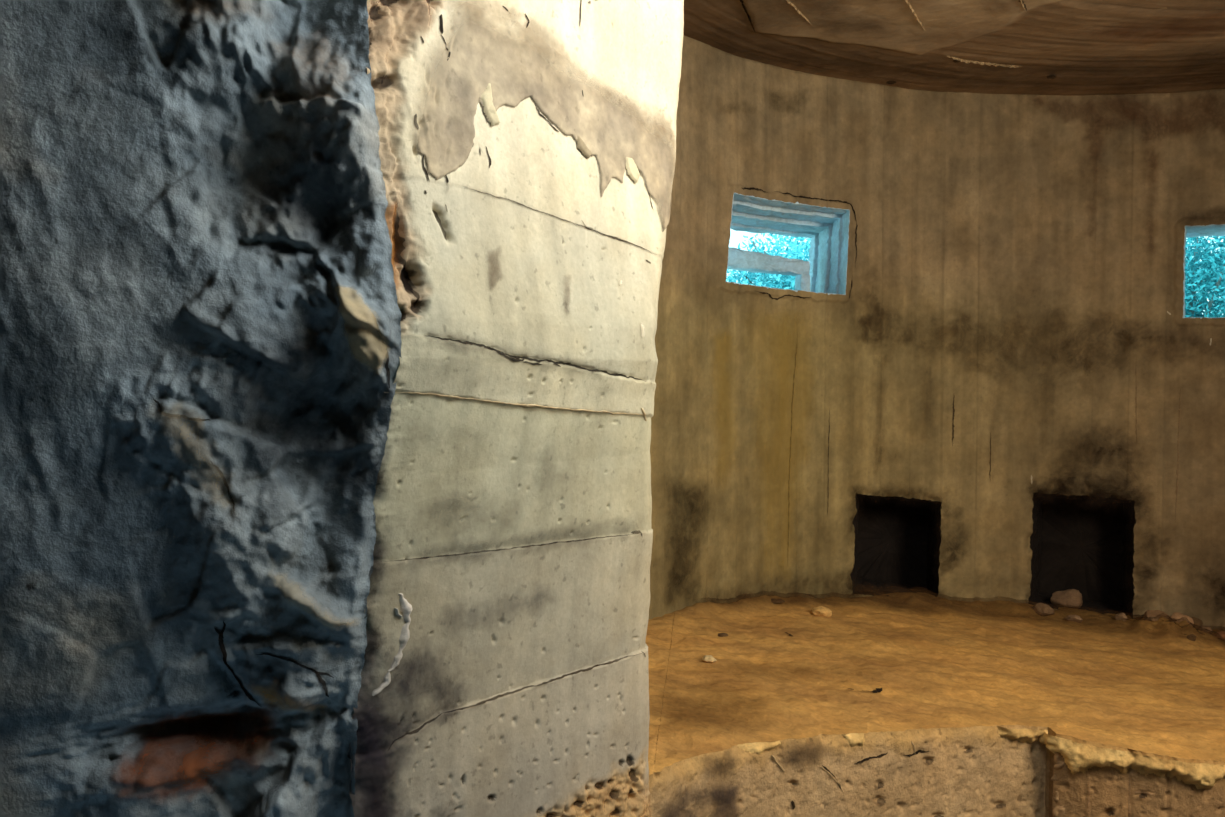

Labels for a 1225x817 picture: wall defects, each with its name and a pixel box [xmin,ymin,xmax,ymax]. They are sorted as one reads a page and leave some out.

peeling [417,18,675,231]
crack [431,336,642,380]
crack [214,621,261,707]
crack [257,653,334,697]
spalling [573,757,639,815]
leakage [664,786,738,817]